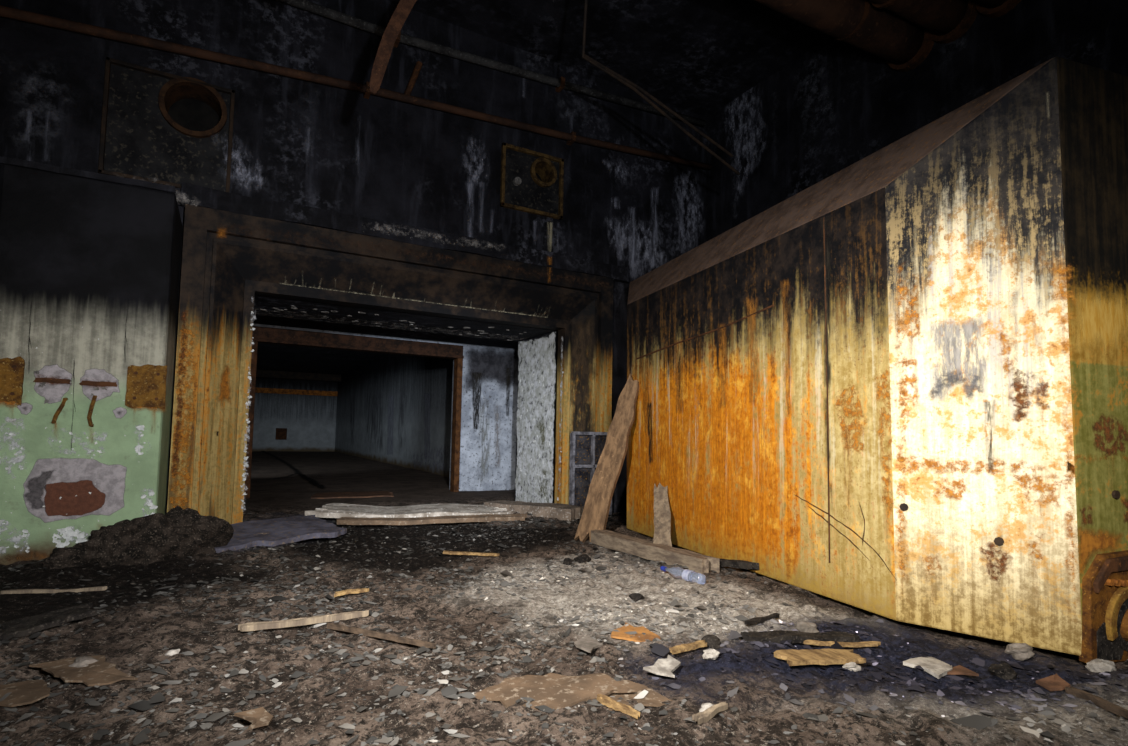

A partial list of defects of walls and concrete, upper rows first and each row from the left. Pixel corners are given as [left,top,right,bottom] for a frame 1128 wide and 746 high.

leakage [729,89,763,191]
leakage [611,189,662,268]
leakage [677,178,701,244]
corrosion [897,286,920,337]
corrosion [1052,267,1128,353]
spalling [0,364,127,548]
corrosion [136,312,197,509]
corrosion [219,368,230,405]
leakage [472,368,510,480]
corrosion [836,360,1128,590]
corrosion [1000,333,1048,422]
peeling [0,519,30,554]